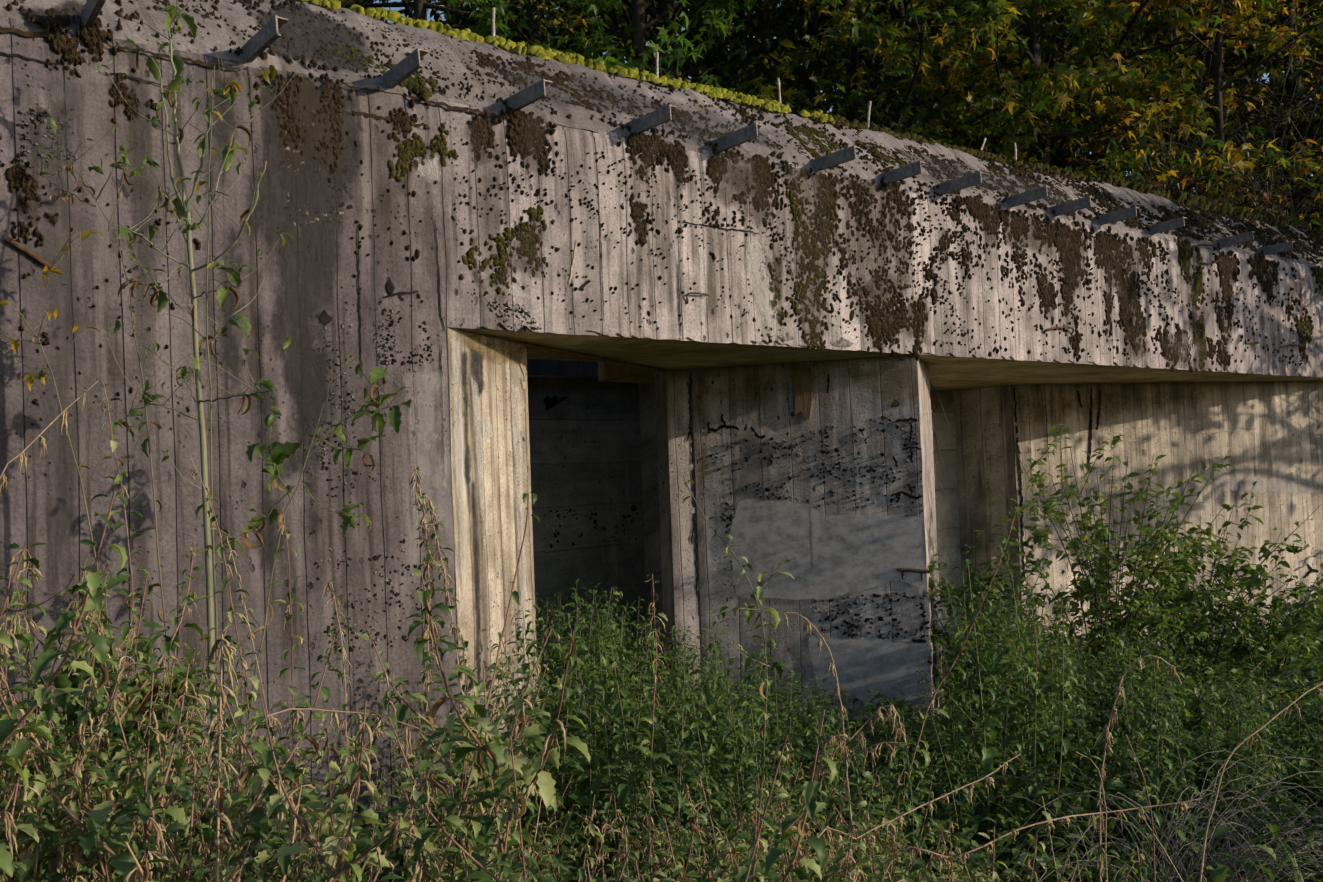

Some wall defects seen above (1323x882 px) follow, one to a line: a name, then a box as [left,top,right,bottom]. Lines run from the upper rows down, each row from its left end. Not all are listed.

damp [260,7,371,73]
damp [210,77,236,181]
damp [221,67,362,530]